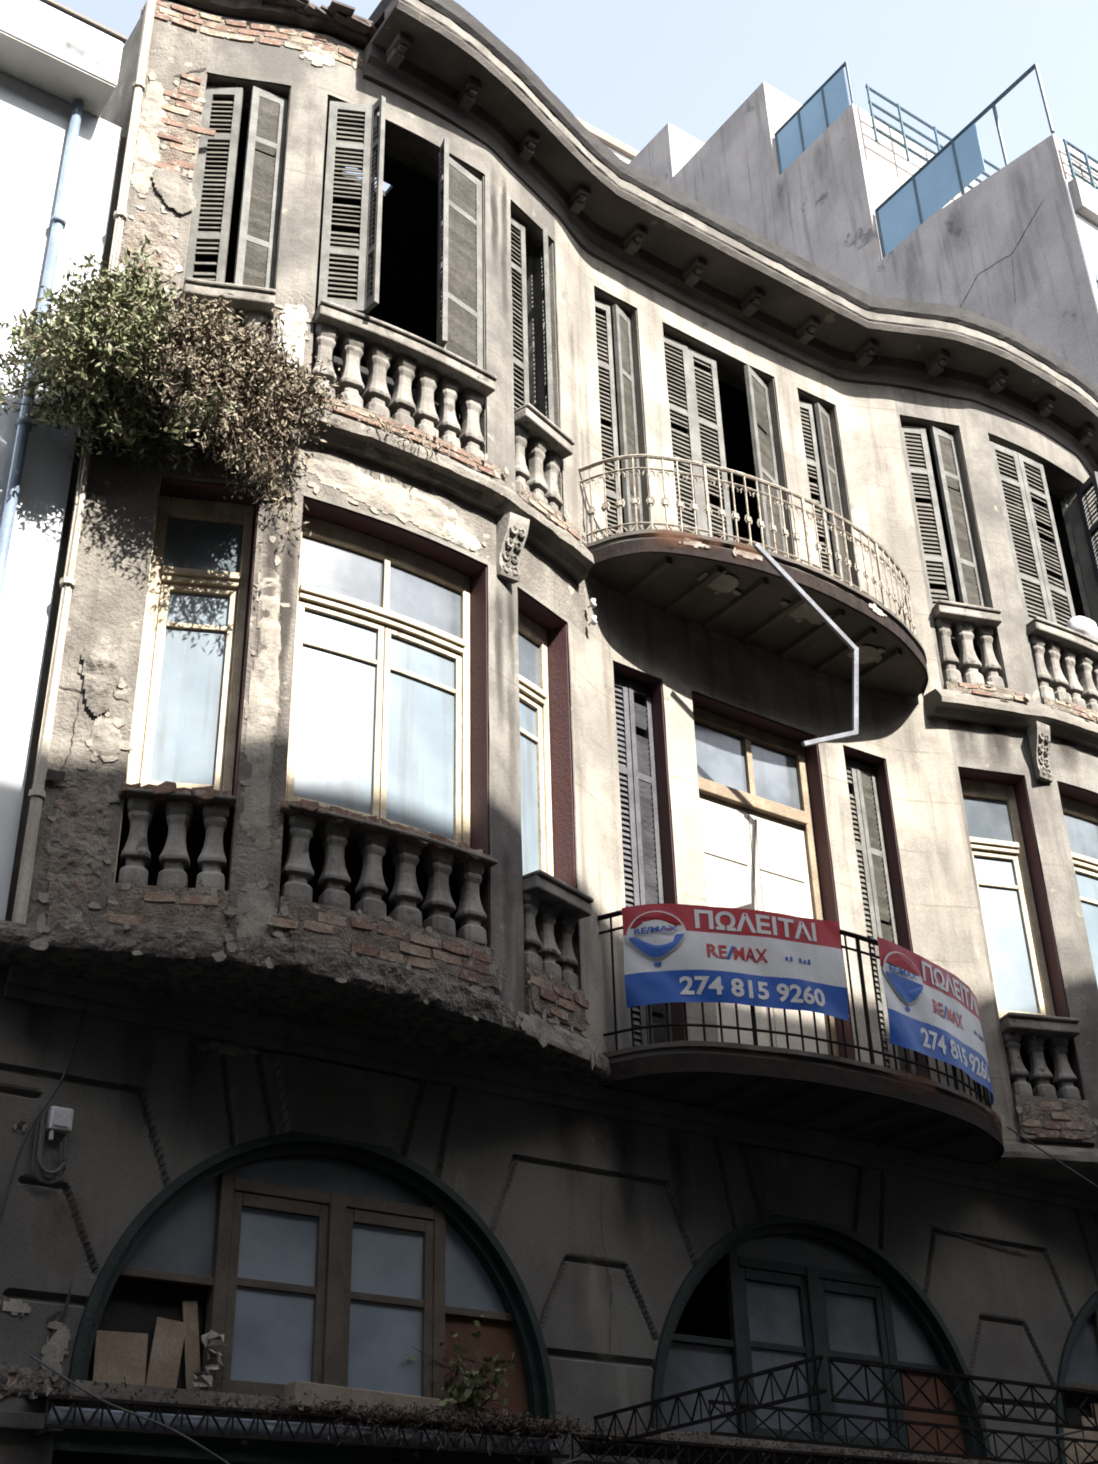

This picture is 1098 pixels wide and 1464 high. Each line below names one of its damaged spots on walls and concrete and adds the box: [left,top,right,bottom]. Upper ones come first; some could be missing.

flaking render [118,72,216,296]
flaking render [275,304,315,377]
flaking render [316,391,586,541]
flaking render [958,681,1031,703]
flaking render [1055,696,1098,723]
flaking render [29,536,598,1070]
flaking render [1015,1099,1098,1140]
flaking render [40,1321,71,1382]